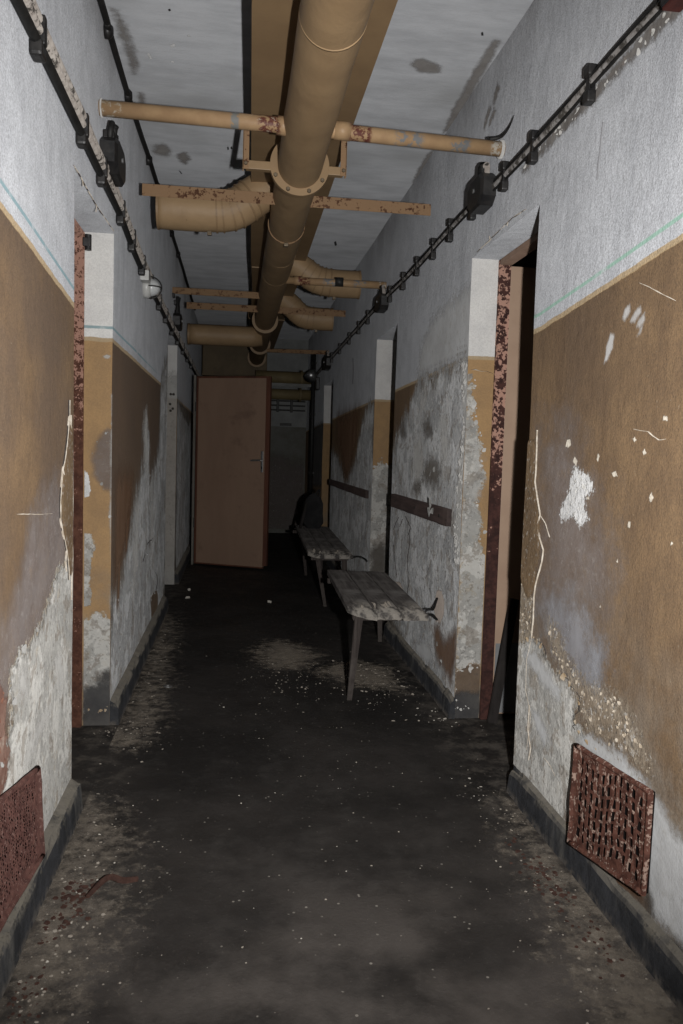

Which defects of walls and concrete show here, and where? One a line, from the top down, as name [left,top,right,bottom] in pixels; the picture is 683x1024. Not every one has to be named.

crack [59,400,73,600]
peeling [0,358,193,831]
peeling [329,349,487,711]
crack [525,430,580,775]
peeling [559,439,594,526]
peeling [513,615,655,822]
rust [614,877,641,897]